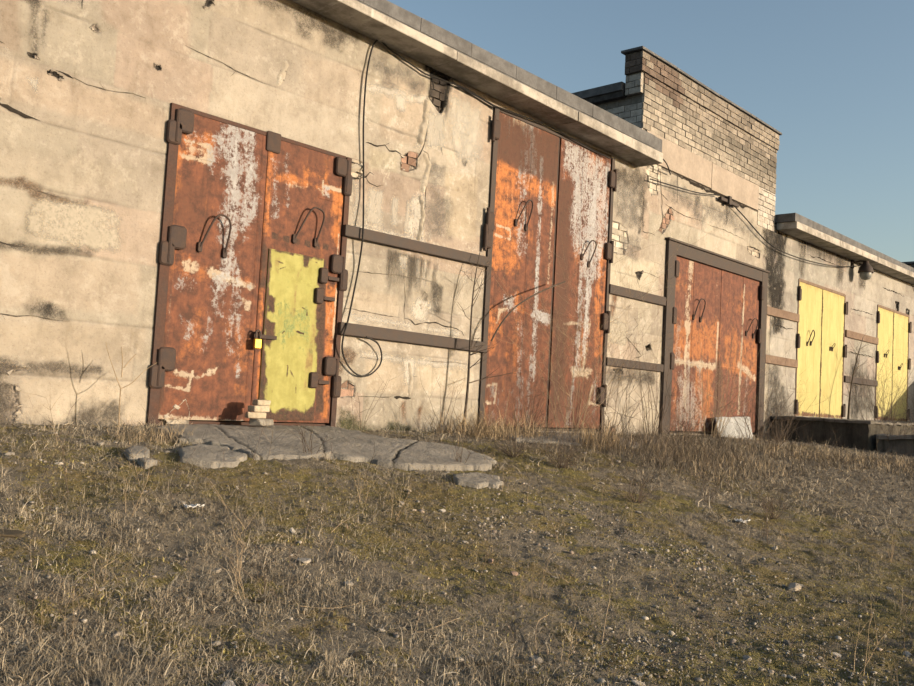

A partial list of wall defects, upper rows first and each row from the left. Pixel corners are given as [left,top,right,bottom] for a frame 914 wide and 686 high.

crack [185,45,265,84]
crack [56,70,145,98]
crack [0,103,40,121]
crack [366,122,443,161]
spalling [400,151,418,172]
leakage [0,358,18,374]
leakage [29,362,102,375]